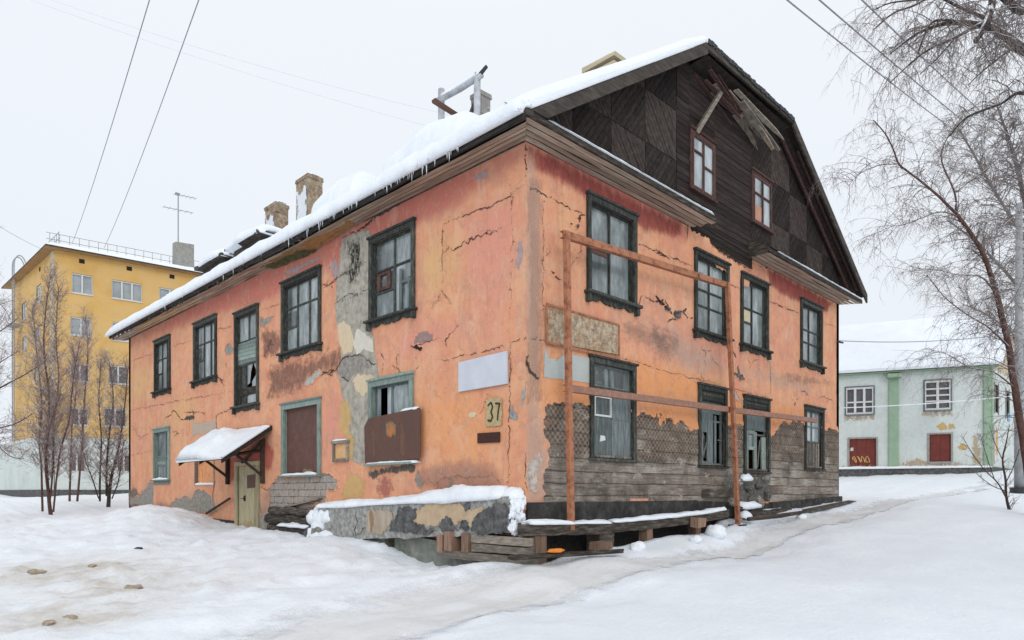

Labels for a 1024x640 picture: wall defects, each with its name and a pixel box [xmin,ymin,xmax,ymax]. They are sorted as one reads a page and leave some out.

water stain [535,153,680,234]
water stain [262,331,280,355]
water stain [267,220,415,496]
crack [321,144,584,488]
crack [617,295,772,397]
crack [131,364,231,454]
flaking render [268,320,374,508]
spalling [525,348,839,502]
spalling [129,481,155,506]
spalling [170,488,217,515]
spalling [348,502,509,536]